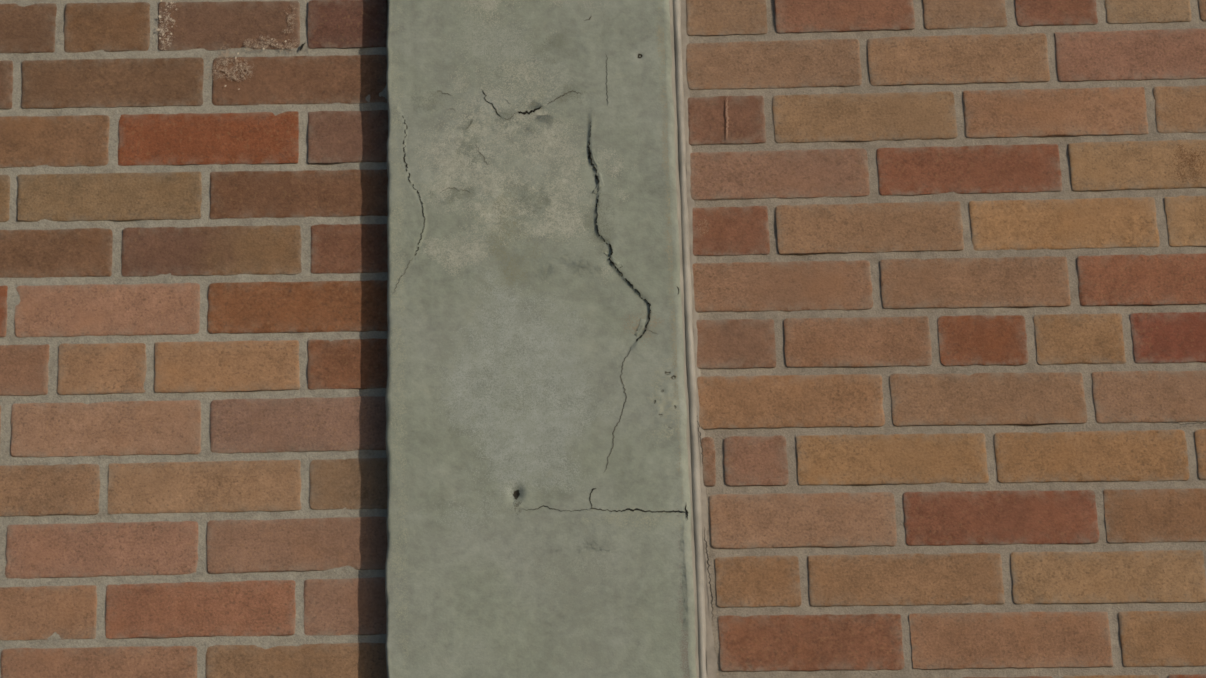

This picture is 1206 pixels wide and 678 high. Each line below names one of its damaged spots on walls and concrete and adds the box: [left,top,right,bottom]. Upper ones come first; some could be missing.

crack [395,111,425,289]
crack [524,56,713,621]